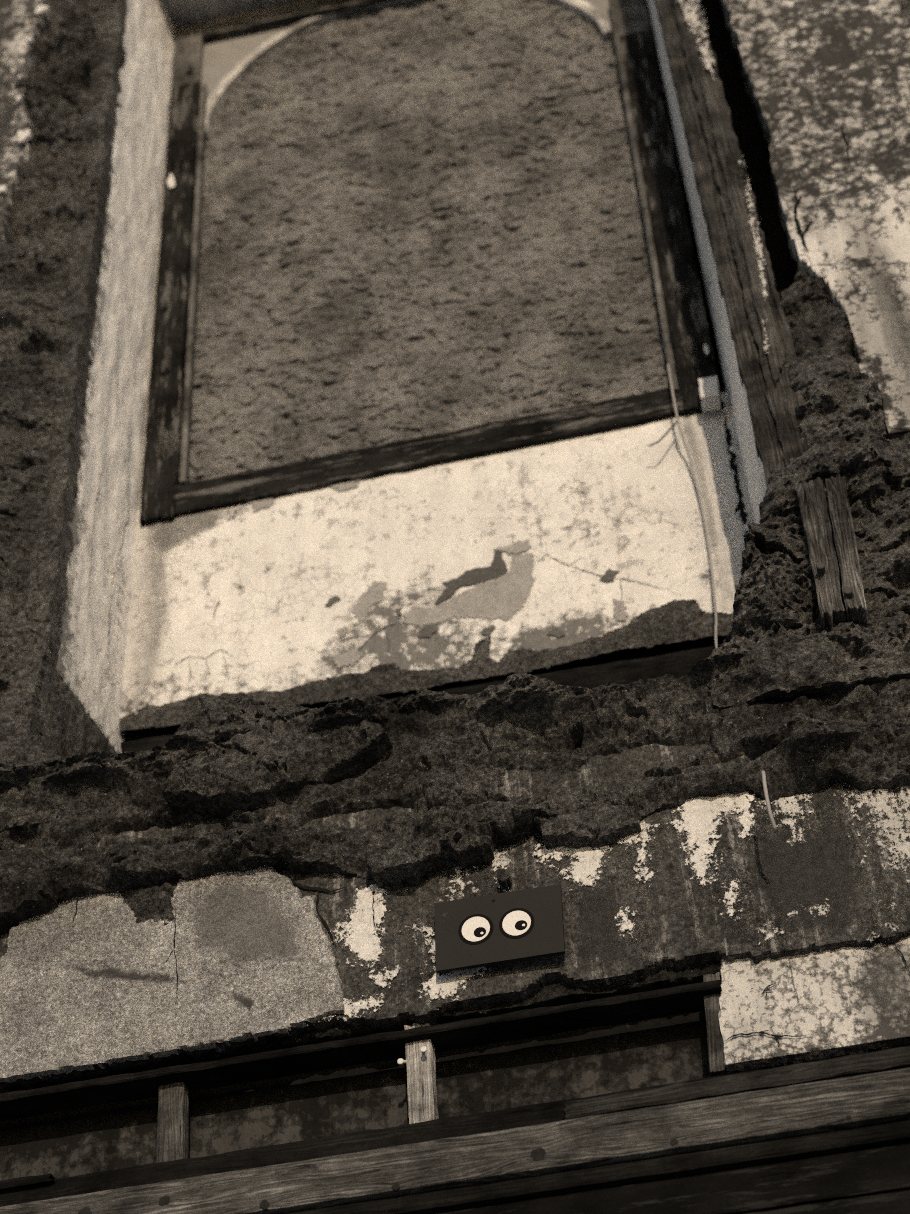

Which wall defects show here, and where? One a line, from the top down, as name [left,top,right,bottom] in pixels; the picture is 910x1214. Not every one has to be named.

peeling [679,0,716,80]
spalling [0,0,128,764]
spalling [119,154,910,731]
crack [167,901,178,1018]
spalling [10,884,400,1092]
peeling [439,863,477,901]
peeling [491,846,513,891]
spalling [405,924,721,1024]
peeling [615,906,637,940]
peeling [532,791,814,920]
peeling [756,898,831,945]
peeling [838,783,910,908]